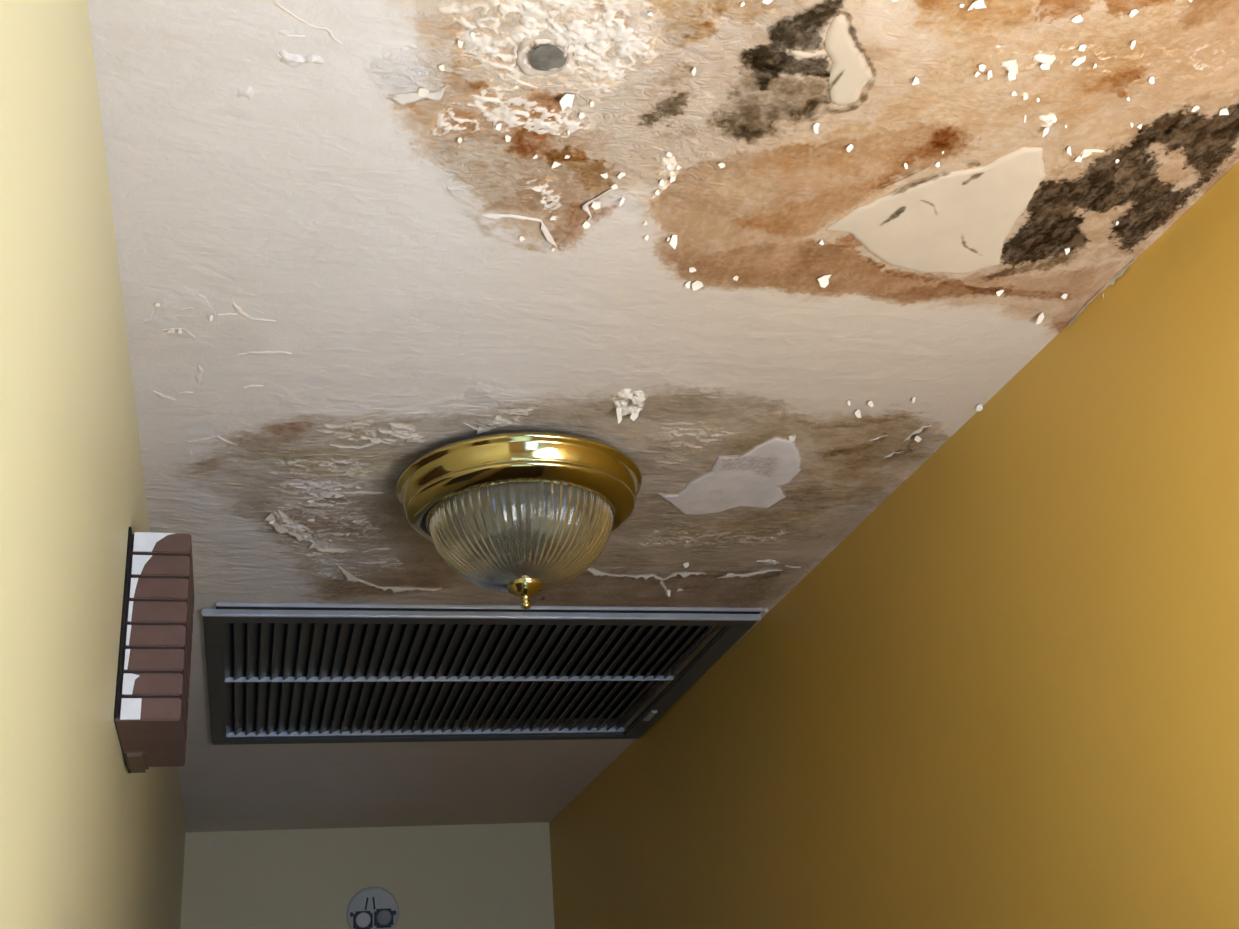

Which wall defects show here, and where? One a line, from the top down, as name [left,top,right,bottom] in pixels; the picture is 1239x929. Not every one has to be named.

peeling [481,155,570,252]
peeling [389,0,675,143]
peeling [582,172,625,229]
peeling [641,152,682,241]
mould [641,93,686,125]
mould [743,0,843,94]
peeling [788,14,875,111]
peeling [960,0,986,11]
peeling [819,32,1238,274]
leakage [1001,104,1239,327]
peeling [817,274,831,288]
peeling [586,418,802,597]